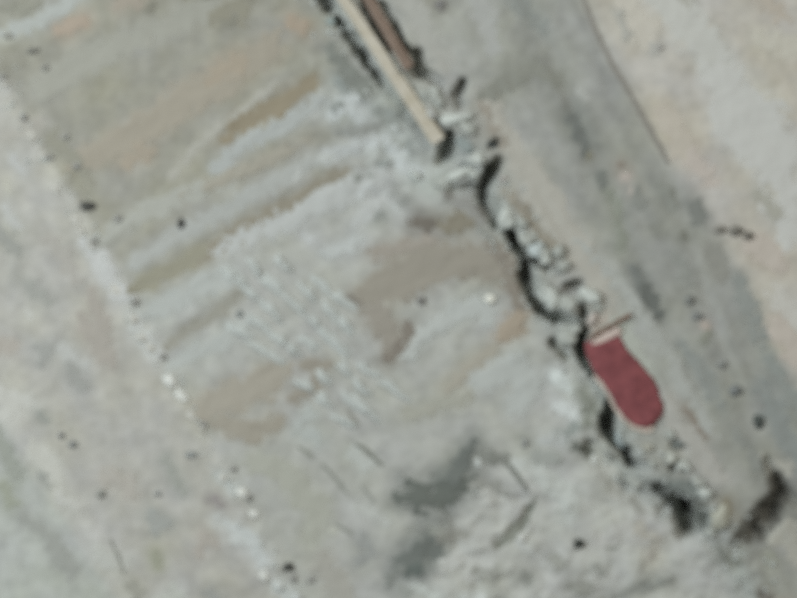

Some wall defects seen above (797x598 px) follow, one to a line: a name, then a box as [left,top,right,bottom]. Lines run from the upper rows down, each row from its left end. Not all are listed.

crack [582,0,670,164]
crack [551,339,568,360]
crack [346,410,383,466]
crack [297,446,376,504]
crack [494,458,536,549]